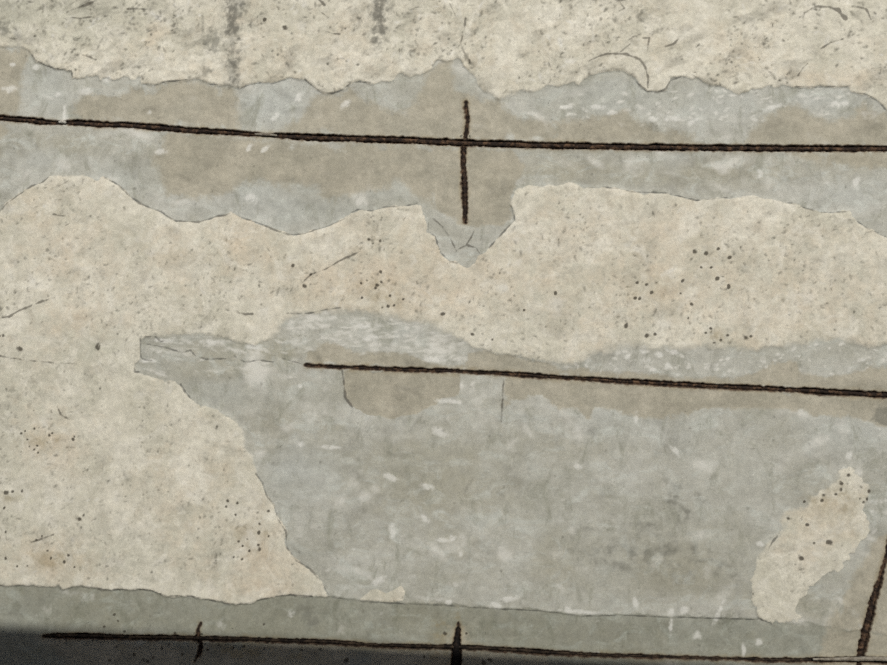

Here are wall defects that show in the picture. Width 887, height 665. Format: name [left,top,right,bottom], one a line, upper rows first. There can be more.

spalling [0,35,887,327]
flaking render [0,245,887,665]